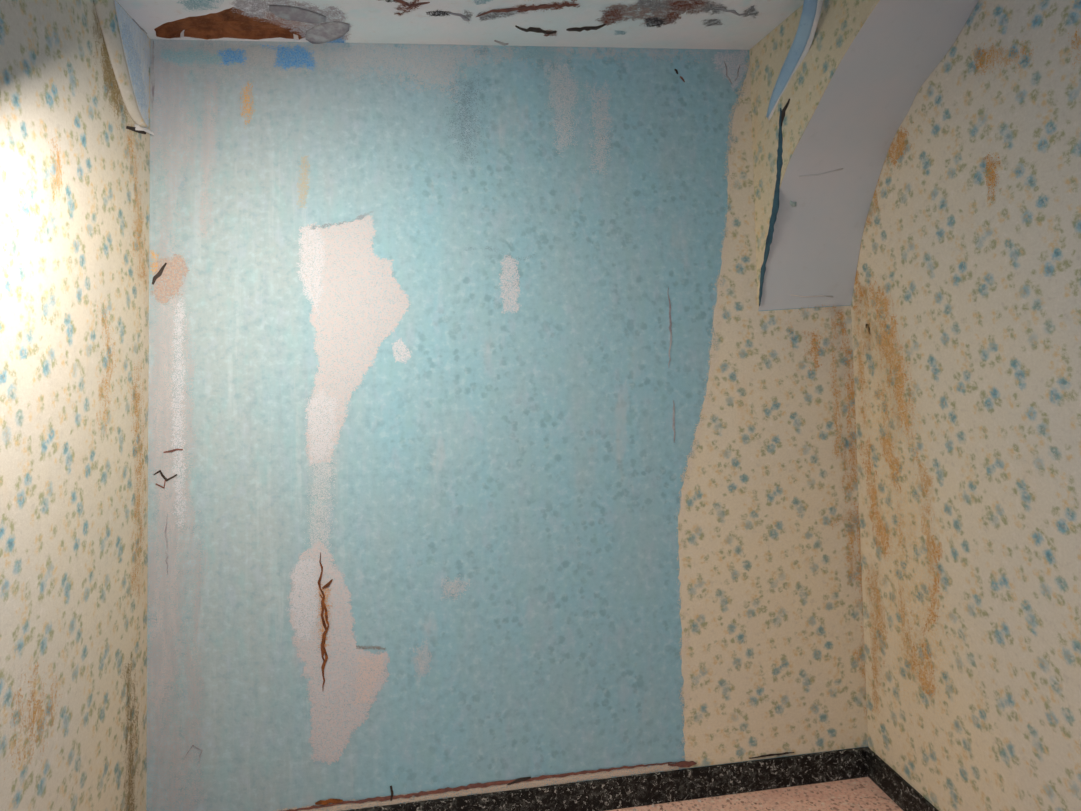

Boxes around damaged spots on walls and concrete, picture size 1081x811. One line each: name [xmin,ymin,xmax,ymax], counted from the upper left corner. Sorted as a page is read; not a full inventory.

flaking render [566,0,759,35]
spalling [149,250,190,305]
peeling [465,245,535,314]
peeling [286,212,411,765]
crack [315,552,333,688]
flaking render [277,761,697,811]